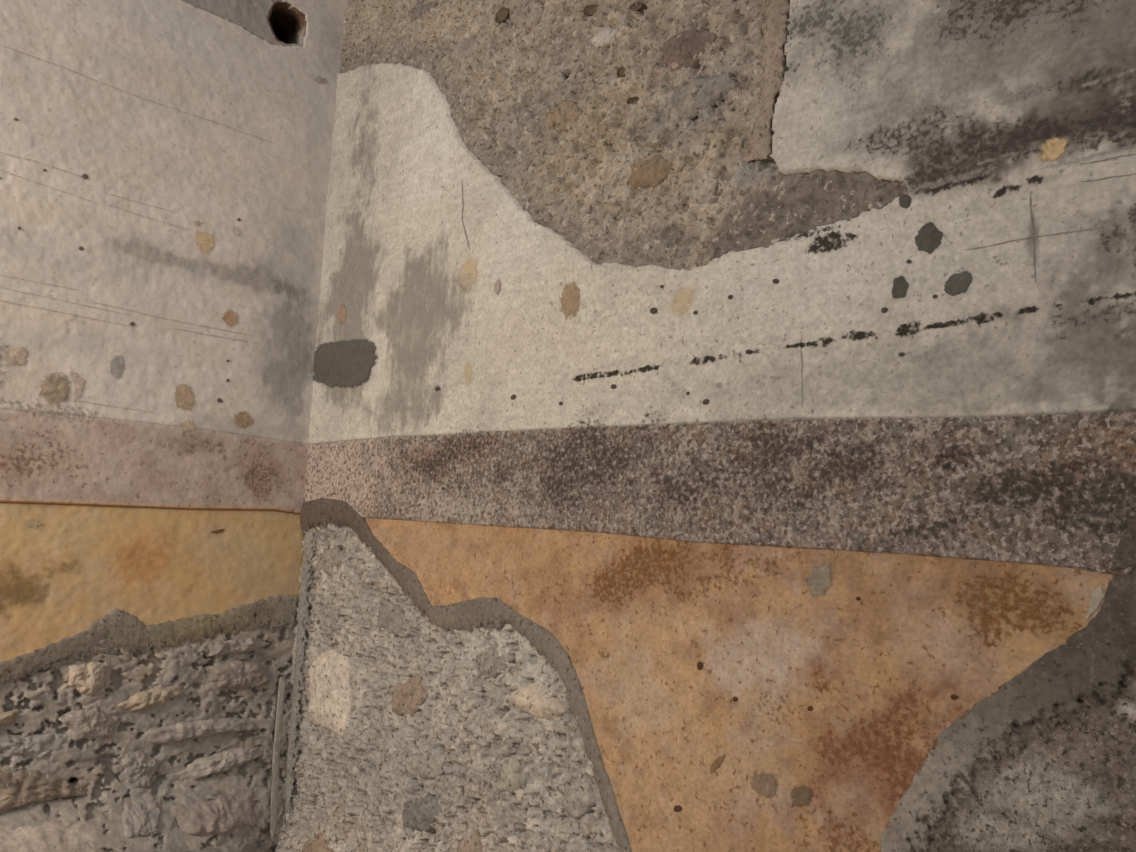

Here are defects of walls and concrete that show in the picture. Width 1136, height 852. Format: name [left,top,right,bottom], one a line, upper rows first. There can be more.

spalling [182,0,286,46]
damp [784,0,891,90]
damp [937,0,1095,47]
spalling [340,0,907,270]
damp [859,96,1136,198]
spalling [1039,138,1070,161]
damp [788,225,857,254]
damp [326,214,463,428]
spalling [0,498,632,852]
spalling [881,513,1136,852]